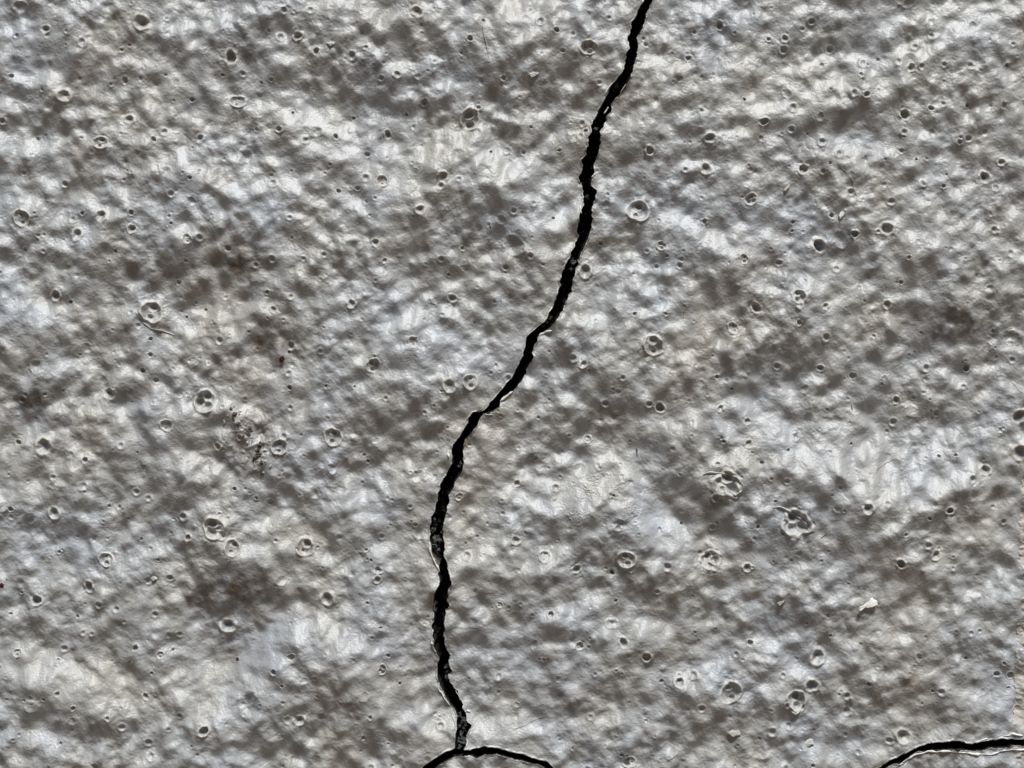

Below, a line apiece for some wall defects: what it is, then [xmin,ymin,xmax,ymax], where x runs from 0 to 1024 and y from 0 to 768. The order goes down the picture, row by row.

crack [421,0,655,768]
crack [876,733,1024,768]